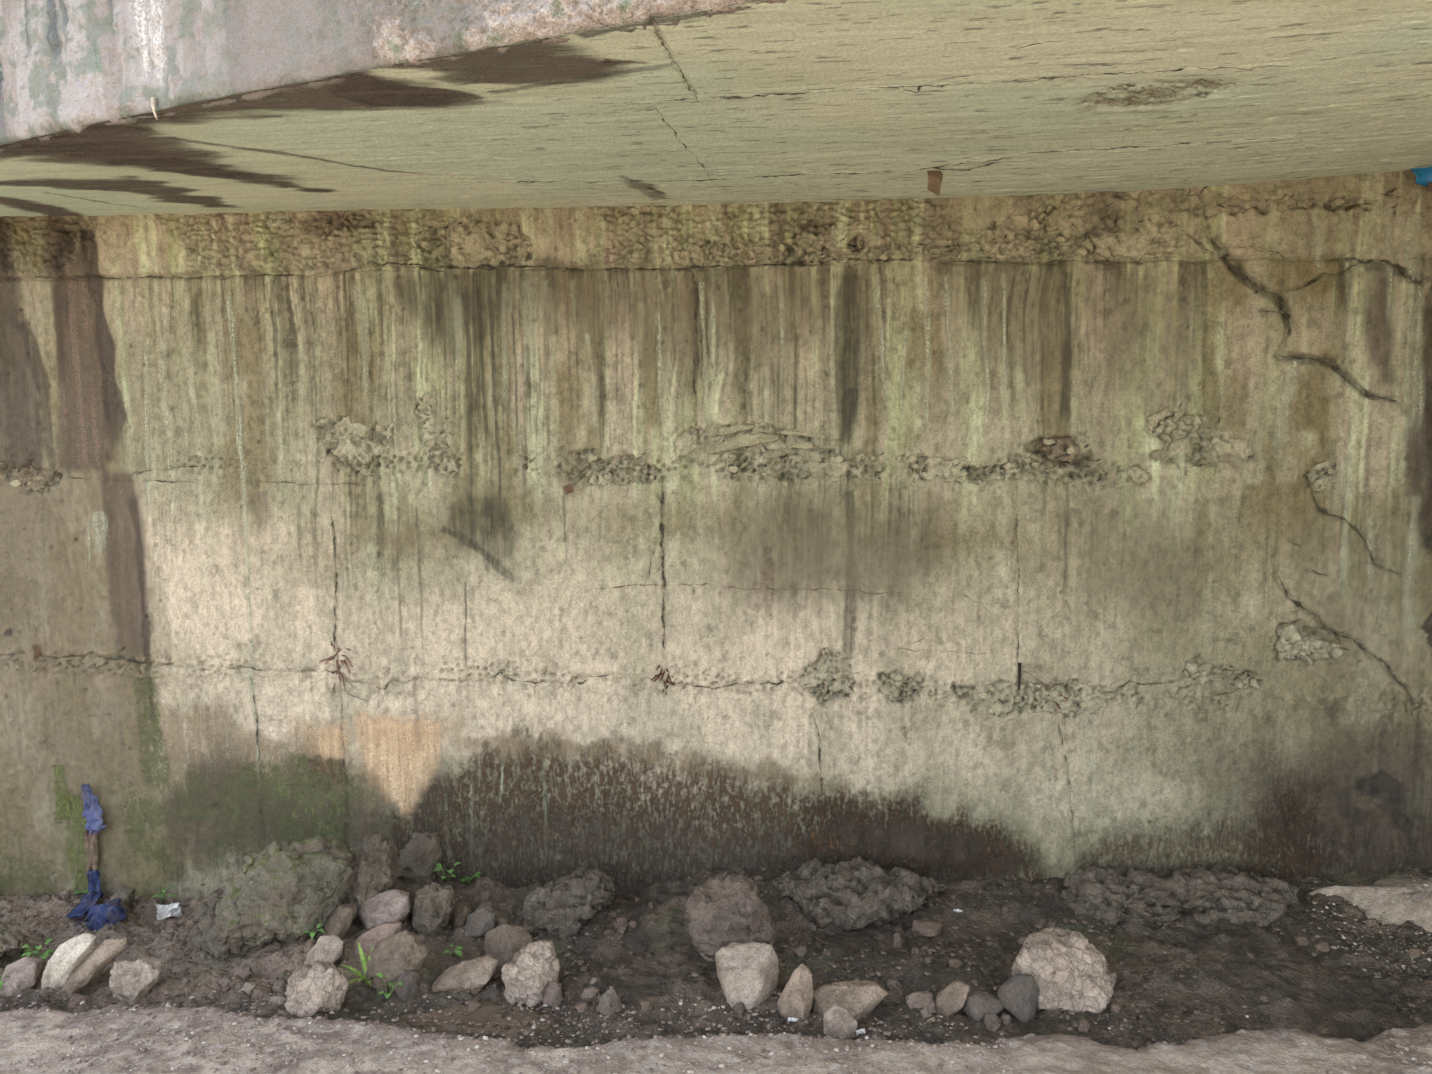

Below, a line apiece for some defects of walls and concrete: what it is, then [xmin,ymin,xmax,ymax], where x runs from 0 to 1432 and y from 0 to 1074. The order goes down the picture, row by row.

damp [0,0,713,653]
peeling [559,448,651,485]
spalling [674,420,885,482]
damp [839,278,859,442]
spalling [908,432,1102,486]
damp [1062,276,1071,413]
crack [1308,468,1374,563]
damp [1409,295,1432,544]
crack [1278,542,1413,700]
peeling [1421,613,1432,646]
spalling [951,679,1114,718]
damp [392,729,1043,889]